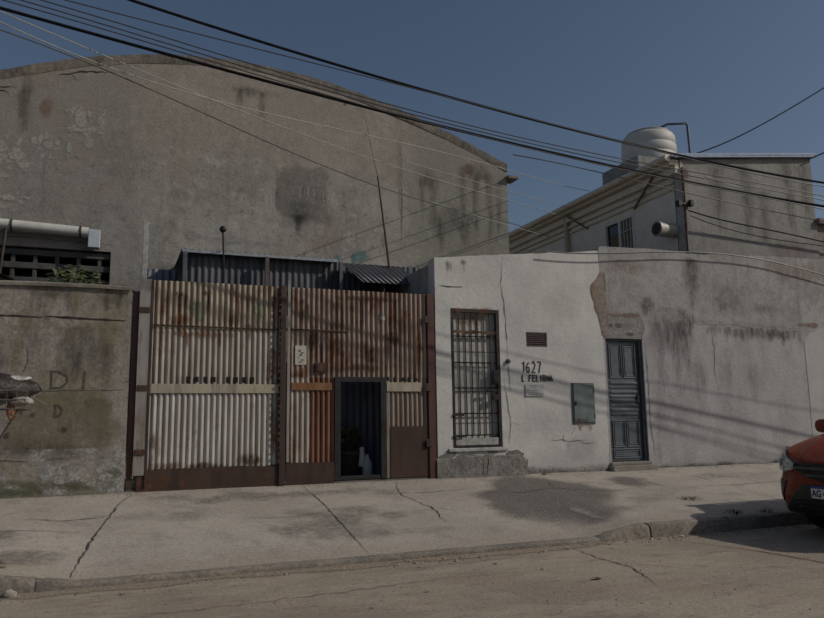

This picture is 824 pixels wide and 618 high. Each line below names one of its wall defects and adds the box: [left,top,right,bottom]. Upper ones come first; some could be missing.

crack [0,313,126,321]
peeling [591,272,645,339]